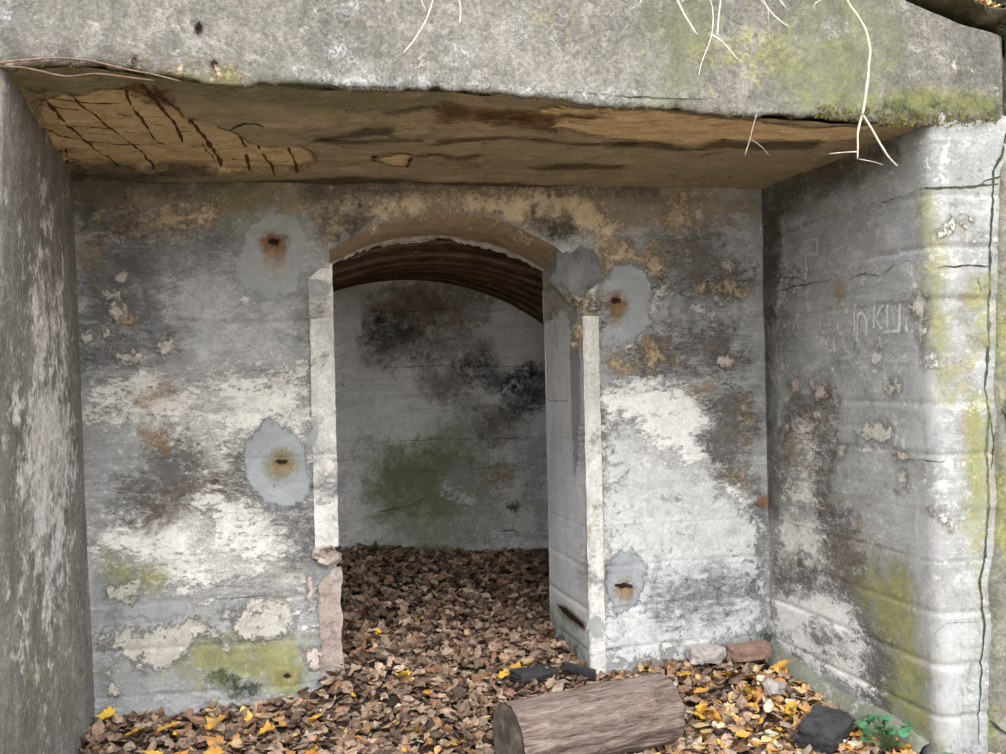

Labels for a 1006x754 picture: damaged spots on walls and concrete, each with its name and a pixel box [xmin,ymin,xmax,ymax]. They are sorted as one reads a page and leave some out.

leakage [67,161,234,228]
rust [259,232,286,256]
leakage [247,177,550,187]
leakage [526,203,577,239]
leakage [79,230,237,372]
rust [606,292,628,317]
leakage [761,137,899,516]
peeling [0,46,878,720]
peeling [861,415,911,496]
crack [776,134,1006,742]
rust [615,583,633,597]